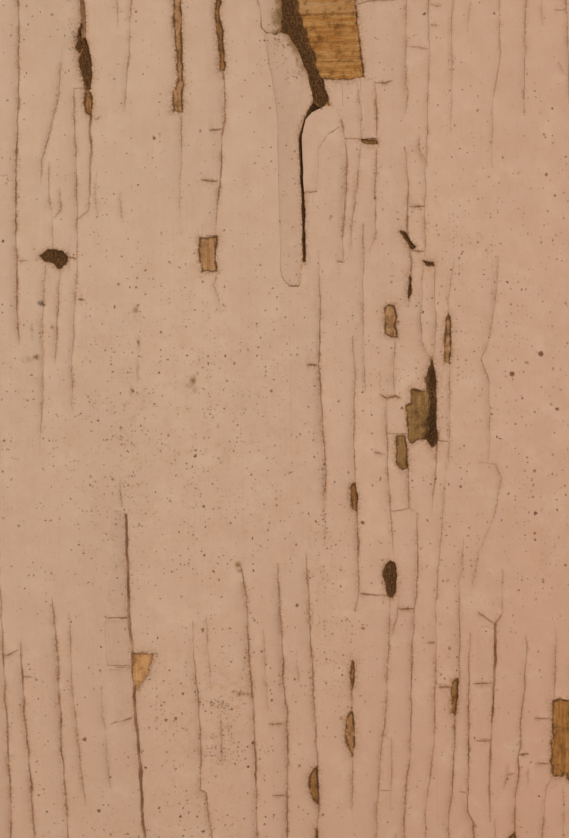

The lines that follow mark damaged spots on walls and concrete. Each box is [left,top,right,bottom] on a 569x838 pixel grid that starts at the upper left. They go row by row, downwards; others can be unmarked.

crack [14,0,29,346]
peeling [38,162,77,452]
crack [39,0,102,412]
crack [198,0,227,313]
peeling [256,0,400,286]
crack [400,0,473,363]
crack [0,548,45,838]
peeling [105,480,156,838]
crack [234,139,382,838]
peeling [359,260,456,838]
crack [389,256,530,838]
peeling [534,629,569,838]